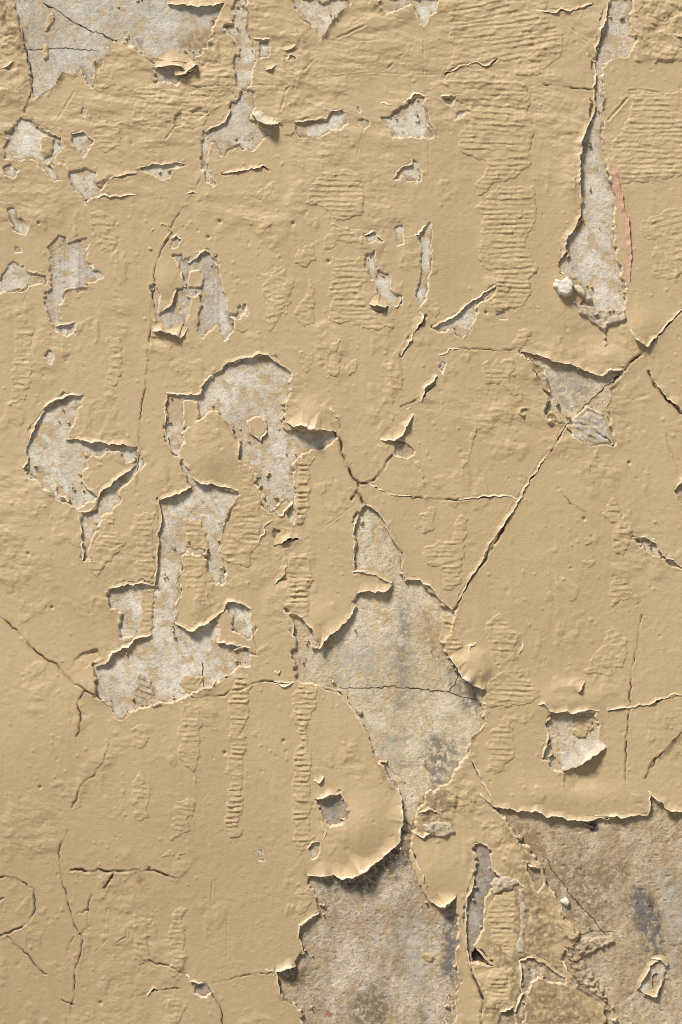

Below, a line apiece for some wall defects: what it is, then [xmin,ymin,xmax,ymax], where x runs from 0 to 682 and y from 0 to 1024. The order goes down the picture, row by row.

peeling [3,119,136,202]
peeling [13,0,438,185]
peeling [553,0,636,347]
peeling [0,236,103,336]
peeling [150,234,253,340]
peeling [22,392,144,561]
peeling [93,350,342,721]
crack [333,309,682,611]
peeling [520,349,624,447]
crack [6,621,102,735]
peeling [266,504,682,1024]
crack [58,845,92,1005]